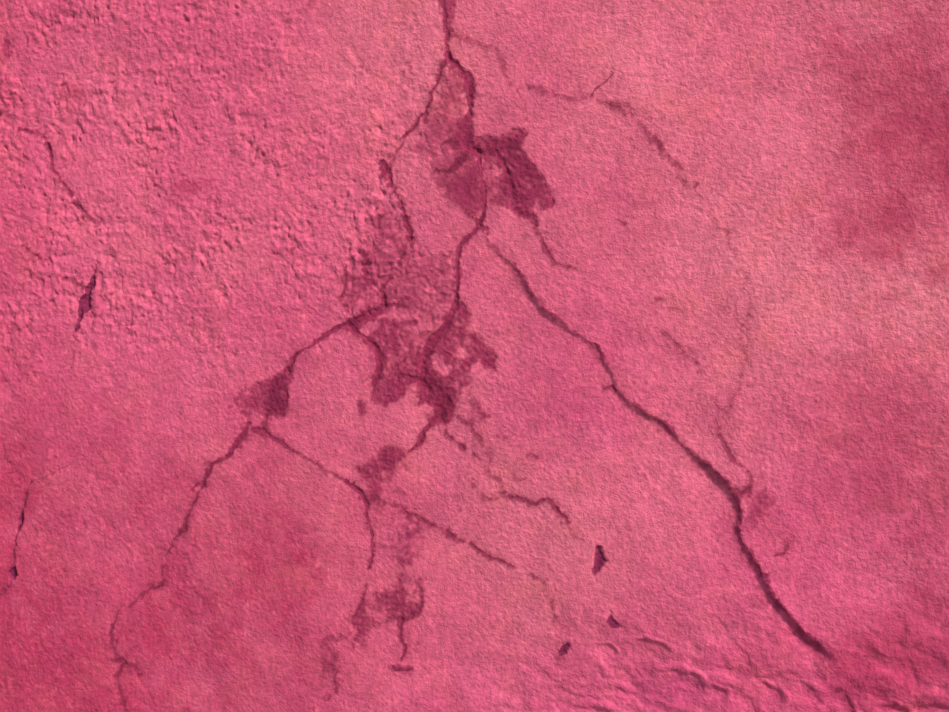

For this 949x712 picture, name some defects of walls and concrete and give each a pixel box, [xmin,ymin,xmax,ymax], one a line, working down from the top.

crack [18,127,101,223]
crack [379,0,558,452]
spalling [475,128,555,225]
crack [284,295,386,374]
spalling [339,215,497,461]
spalling [229,371,292,428]
crack [0,480,32,595]
crack [191,422,570,636]
spalling [356,447,407,499]
crack [604,385,753,532]
crack [391,617,412,671]
crack [751,538,834,658]